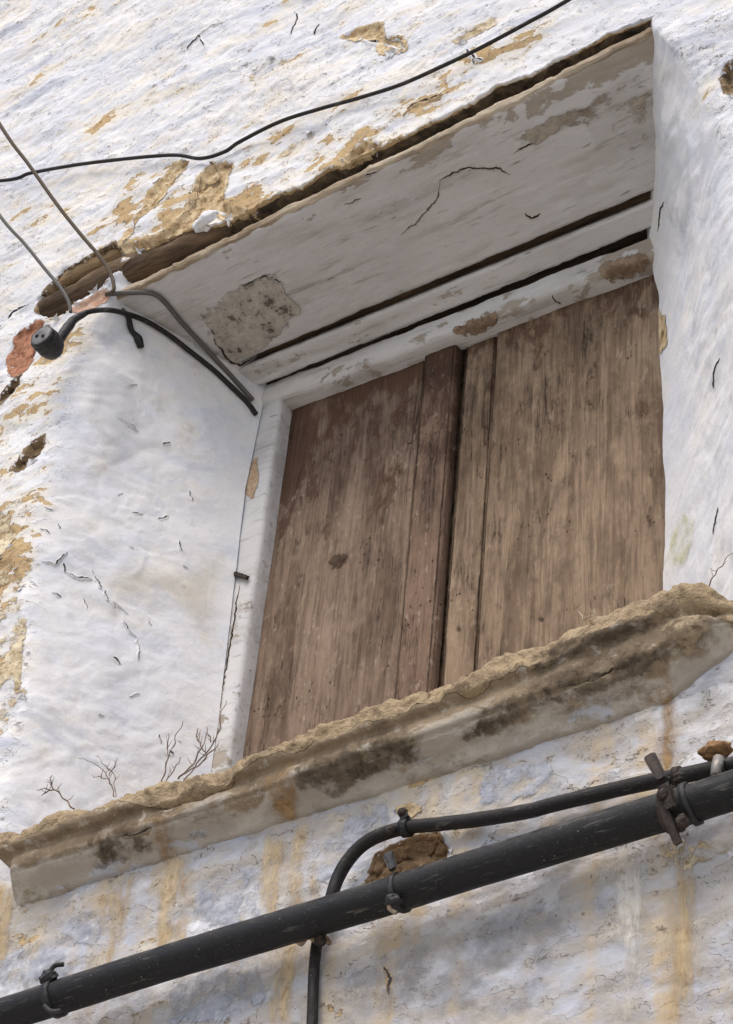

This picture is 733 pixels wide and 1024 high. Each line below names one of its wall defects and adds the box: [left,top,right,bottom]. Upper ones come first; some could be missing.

spalling [339,21,408,60]
crack [400,135,550,235]
spalling [0,157,261,404]
spalling [9,433,46,472]
crack [42,552,141,660]
crack [217,586,240,728]
leakage [530,617,669,705]
leakage [294,737,413,797]
leakage [462,700,526,741]
corrosion [662,696,672,771]
leakage [88,827,150,864]
spalling [361,831,453,885]